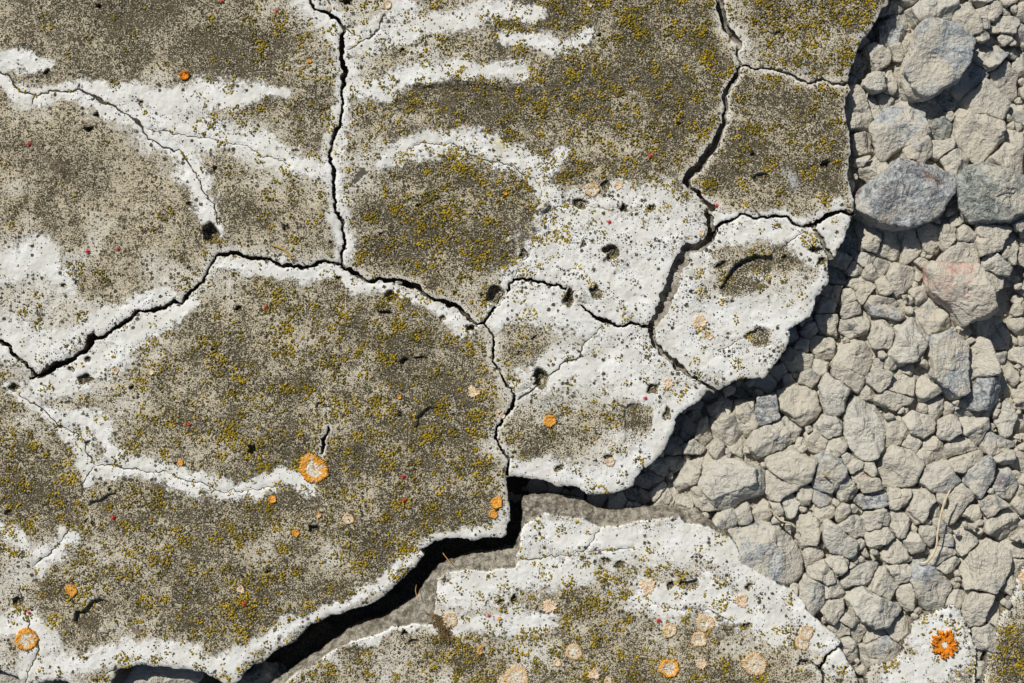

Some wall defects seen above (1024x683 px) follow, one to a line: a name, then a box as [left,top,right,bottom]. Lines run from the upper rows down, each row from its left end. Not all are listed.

spalling [250,112,474,324]
crack [412,142,643,238]
crack [548,0,856,394]
spalling [0,220,231,392]
crack [0,0,573,682]
spalling [713,253,790,299]
spalling [744,326,772,348]
spalling [674,362,739,422]
spalling [271,405,753,683]
crack [518,529,632,560]
spalling [986,538,1024,629]
crack [812,649,849,683]